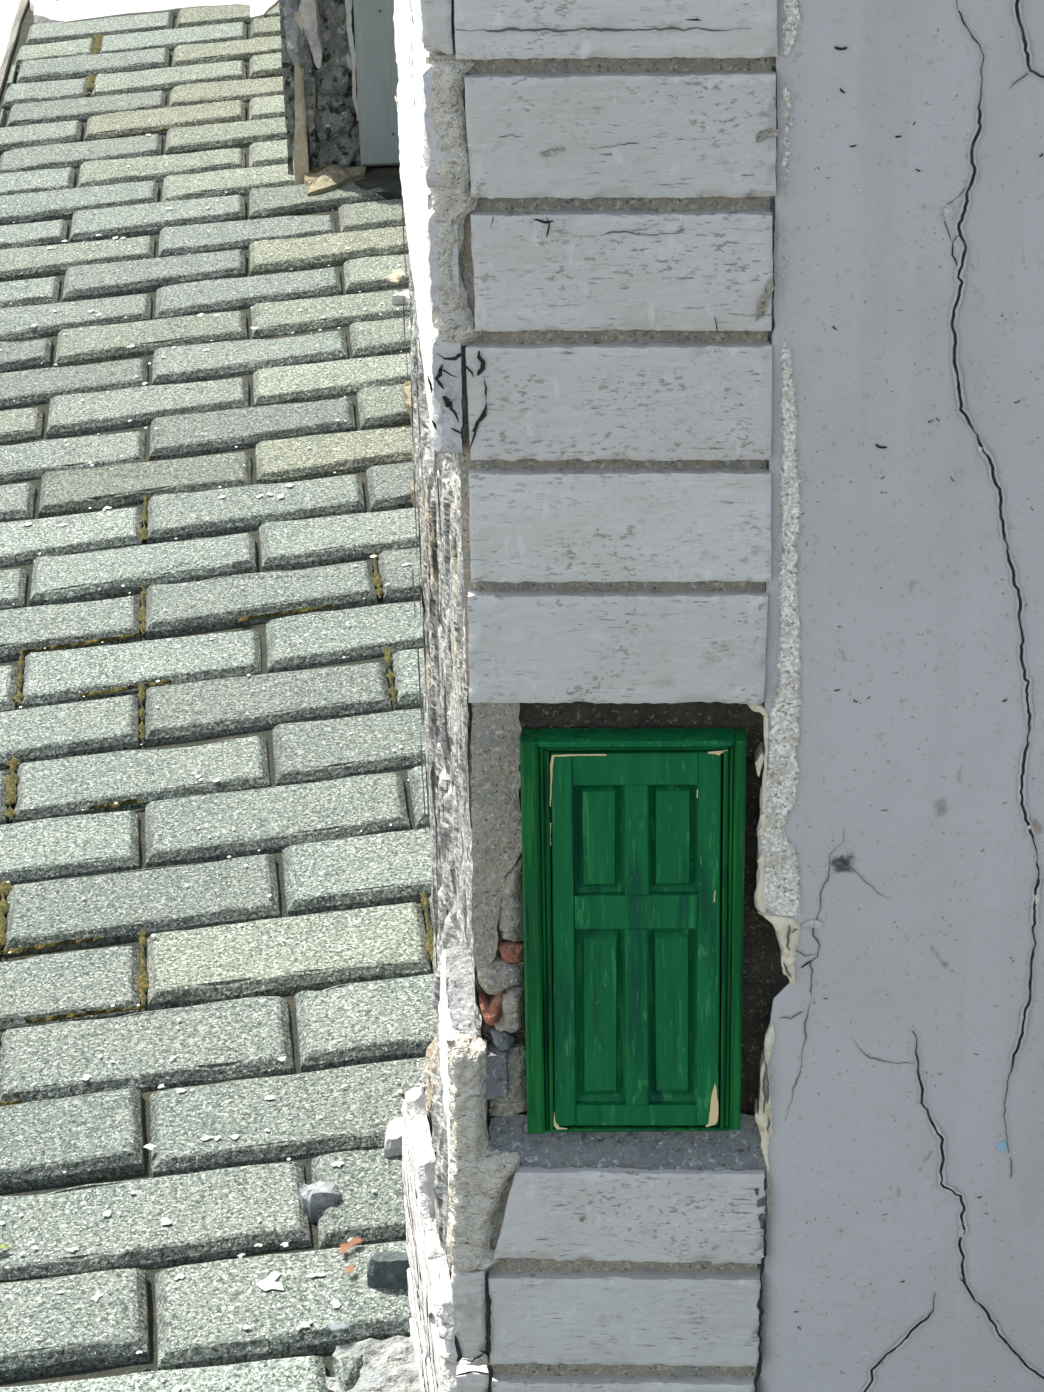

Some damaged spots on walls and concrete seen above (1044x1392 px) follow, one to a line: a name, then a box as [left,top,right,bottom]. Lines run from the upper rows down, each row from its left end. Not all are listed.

crack [422,351,487,453]
crack [944,0,1044,1178]
peeling [747,702,822,983]
spalling [477,856,527,1118]
peeling [754,1023,775,1230]
crack [855,1031,1044,1392]